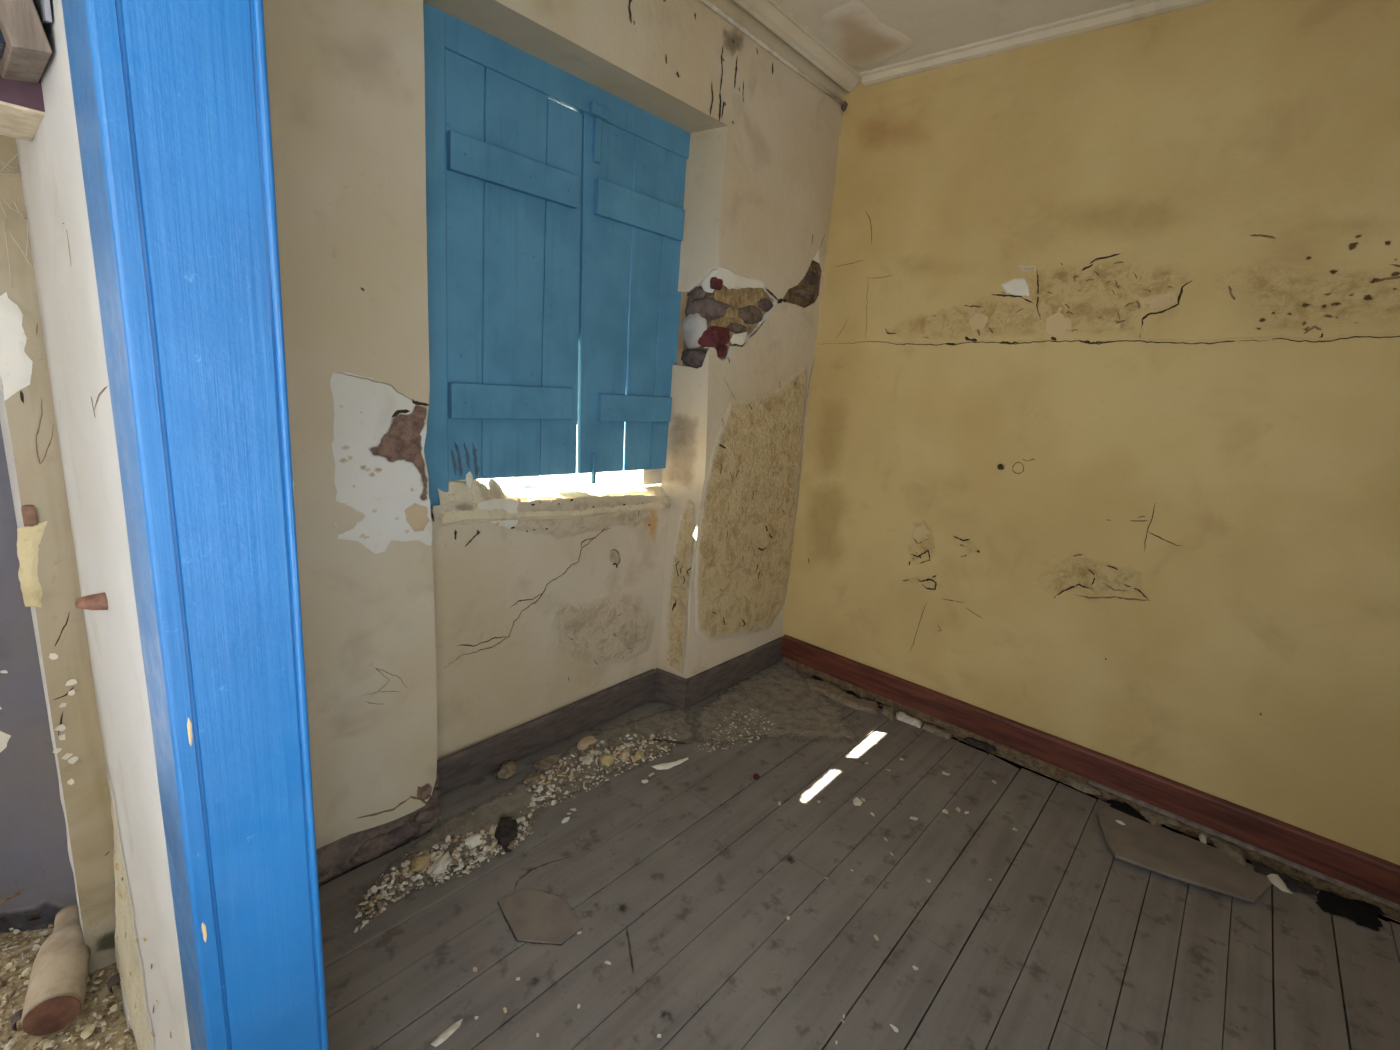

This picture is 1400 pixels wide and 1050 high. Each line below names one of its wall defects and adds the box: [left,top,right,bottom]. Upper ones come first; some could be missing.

peeling [0,292,33,403]
spalling [681,234,825,369]
peeling [883,253,1194,345]
crack [793,211,1400,446]
peeling [330,372,658,554]
crack [444,520,618,670]
peeling [0,731,11,753]